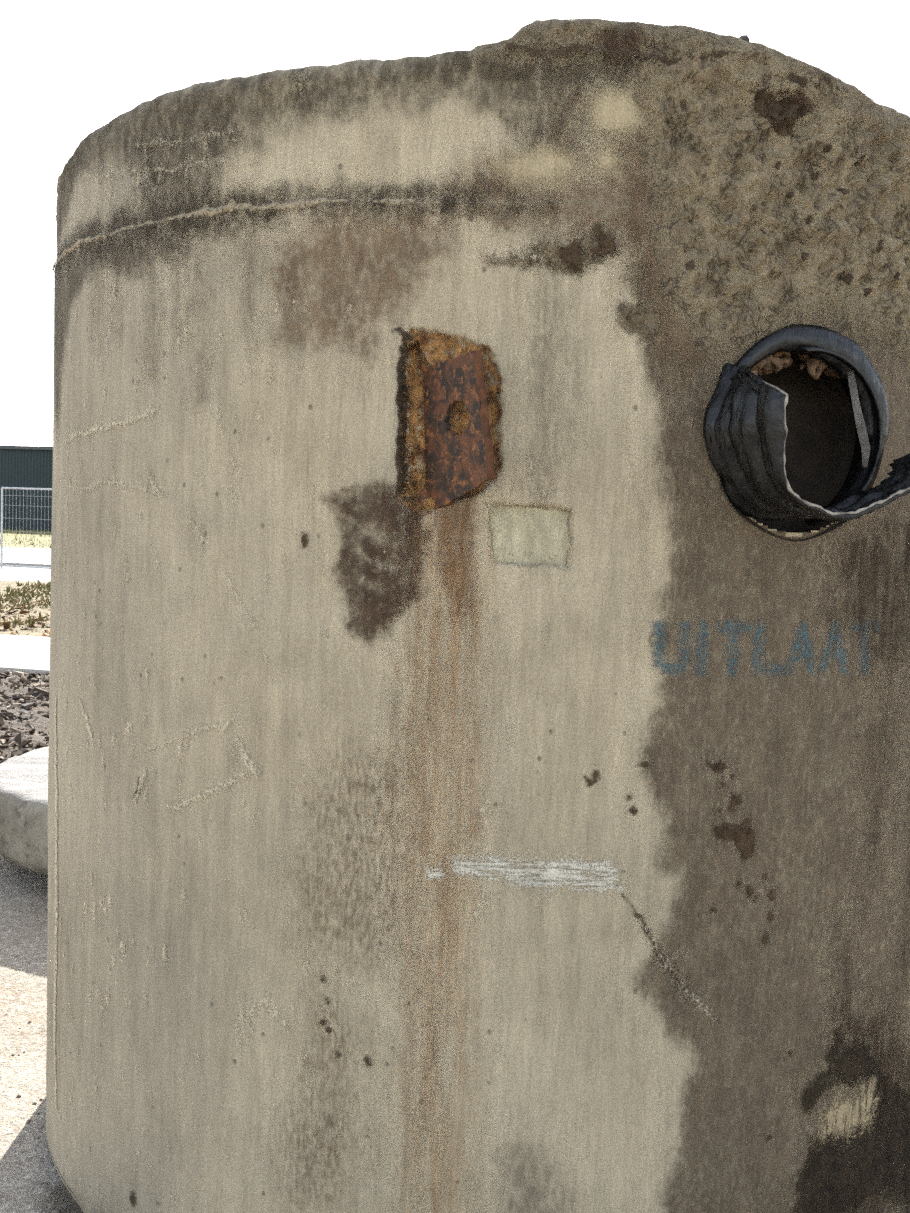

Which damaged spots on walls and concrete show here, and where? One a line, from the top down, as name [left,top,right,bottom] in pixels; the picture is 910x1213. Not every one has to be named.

water stain [53,21,658,427]
rust [397,329,504,516]
water stain [270,114,910,1213]
peeling [425,863,445,880]
crack [616,882,709,1015]
water stain [40,1182,83,1213]